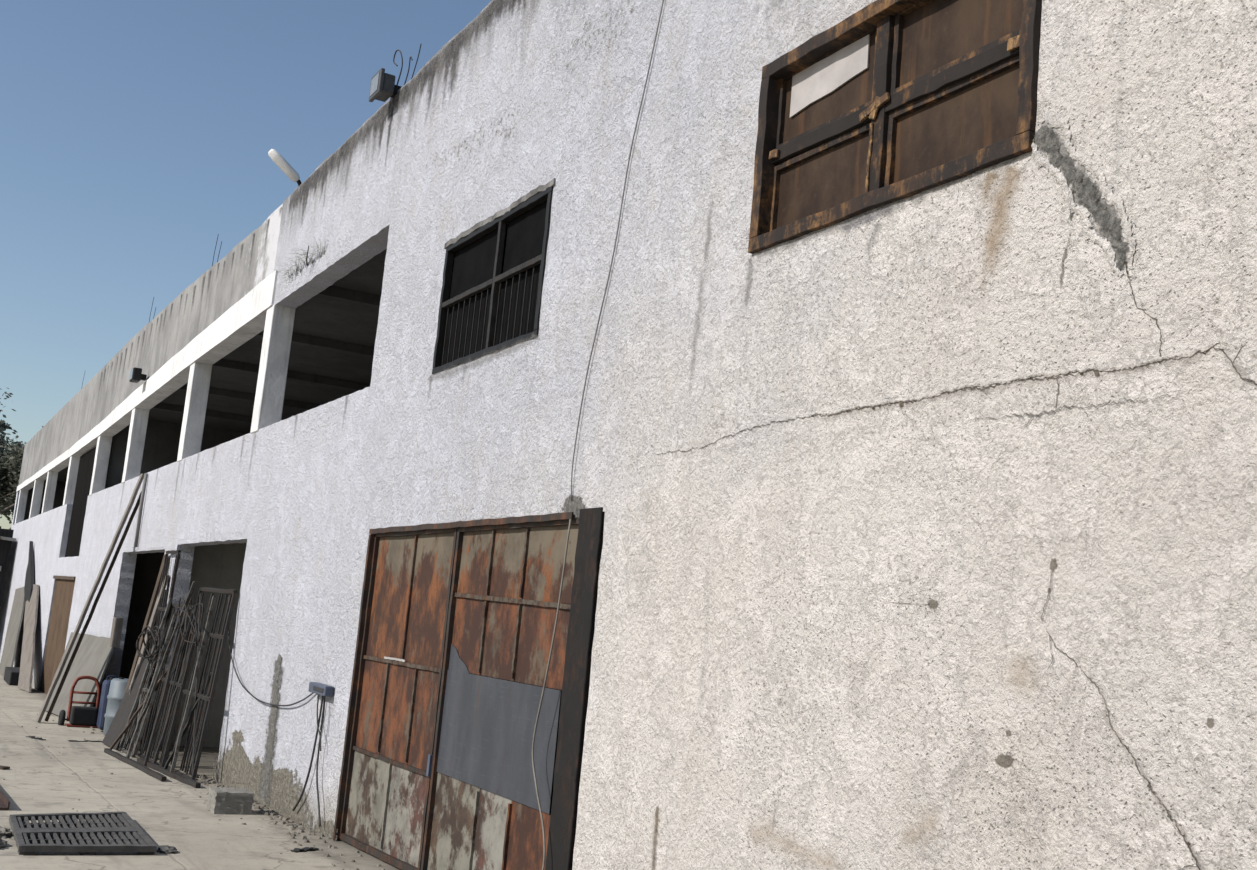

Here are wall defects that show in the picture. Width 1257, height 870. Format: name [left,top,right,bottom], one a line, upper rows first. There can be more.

water stain [100,0,520,382]
spalling [1031,115,1136,290]
crack [652,272,1257,455]
crack [1041,558,1200,870]